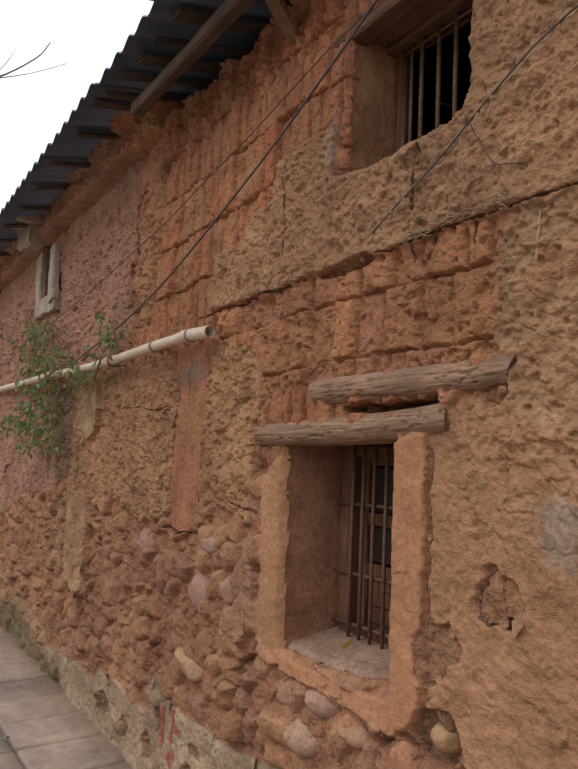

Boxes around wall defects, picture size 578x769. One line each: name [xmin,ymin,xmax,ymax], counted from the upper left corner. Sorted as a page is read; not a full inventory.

crack [205,160,316,319]
crack [375,143,578,263]
spalling [473,565,525,639]